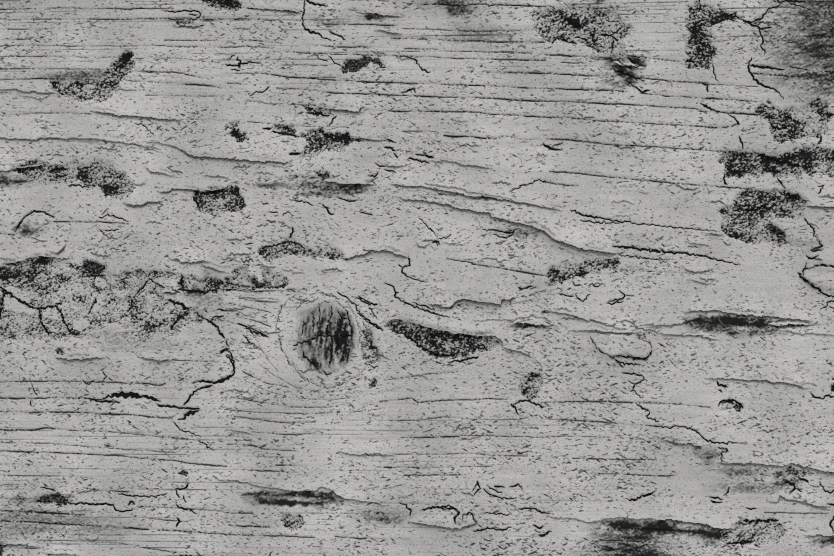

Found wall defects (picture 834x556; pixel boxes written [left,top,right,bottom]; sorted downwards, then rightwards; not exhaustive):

spalling [531,5,645,69]
spalling [685,0,741,70]
crack [740,0,817,99]
spalling [719,99,834,184]
crack [99,210,128,237]
spalling [0,156,246,218]
crack [244,197,372,266]
crack [482,229,515,244]
spalling [718,188,834,246]
spalling [0,227,410,361]
spalling [385,272,834,363]
crack [83,282,278,450]